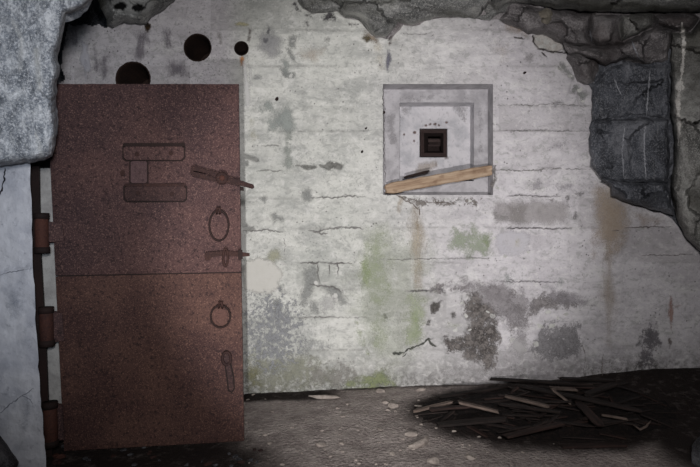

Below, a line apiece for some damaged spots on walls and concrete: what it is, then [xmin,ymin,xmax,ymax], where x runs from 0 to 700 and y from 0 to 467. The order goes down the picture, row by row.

spalling [534,35,563,53]
spalling [296,156,343,172]
spalling [401,196,482,208]
crack [303,262,352,293]
leakage [459,277,533,343]
crack [393,338,437,357]
leakage [626,324,662,371]